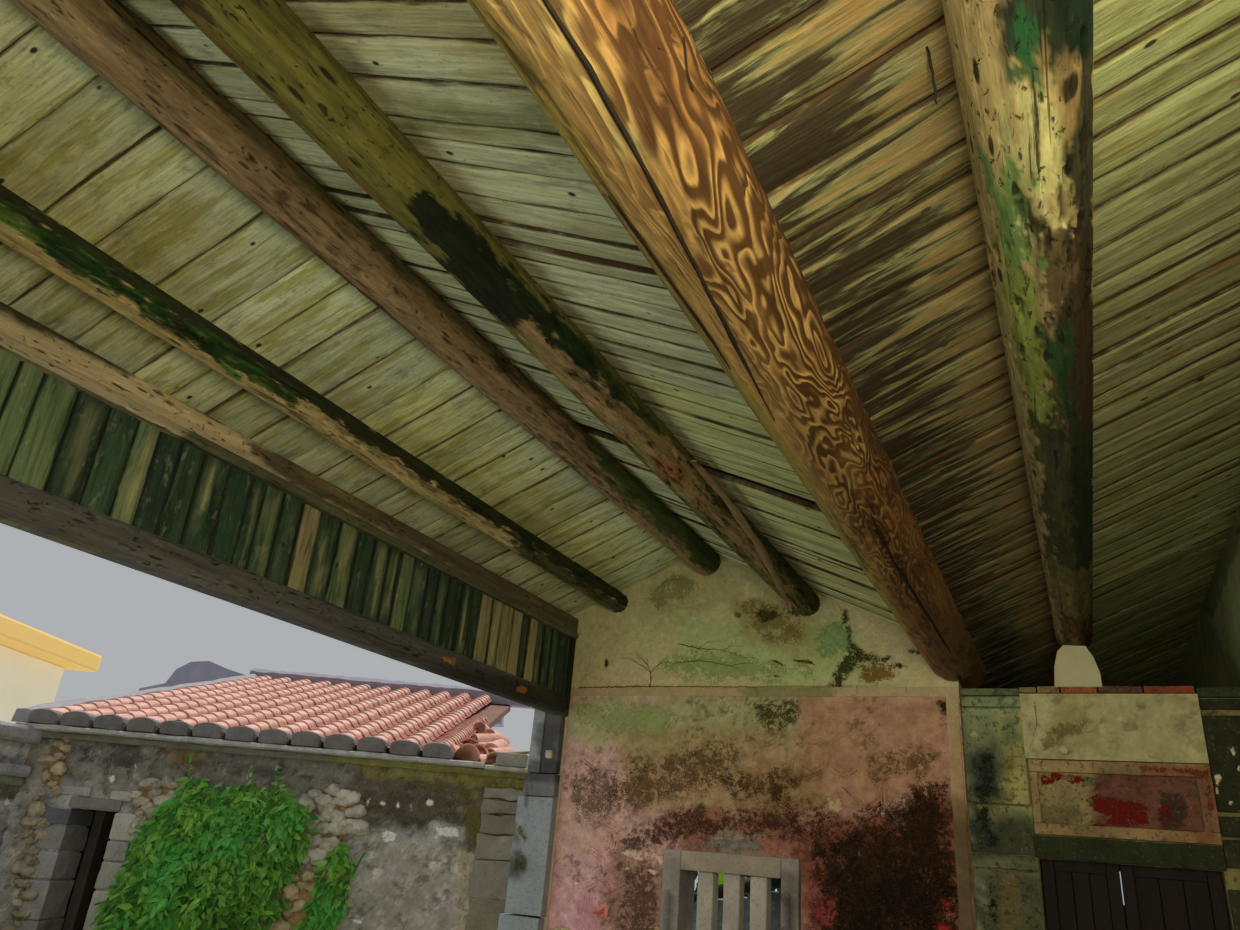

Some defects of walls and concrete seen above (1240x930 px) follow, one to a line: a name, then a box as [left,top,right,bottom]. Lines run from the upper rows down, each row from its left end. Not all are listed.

leakage [734,600,802,644]
peeling [1041,772,1084,785]
peeling [1139,766,1232,812]
peeling [1081,795,1202,832]
leakage [611,767,959,930]